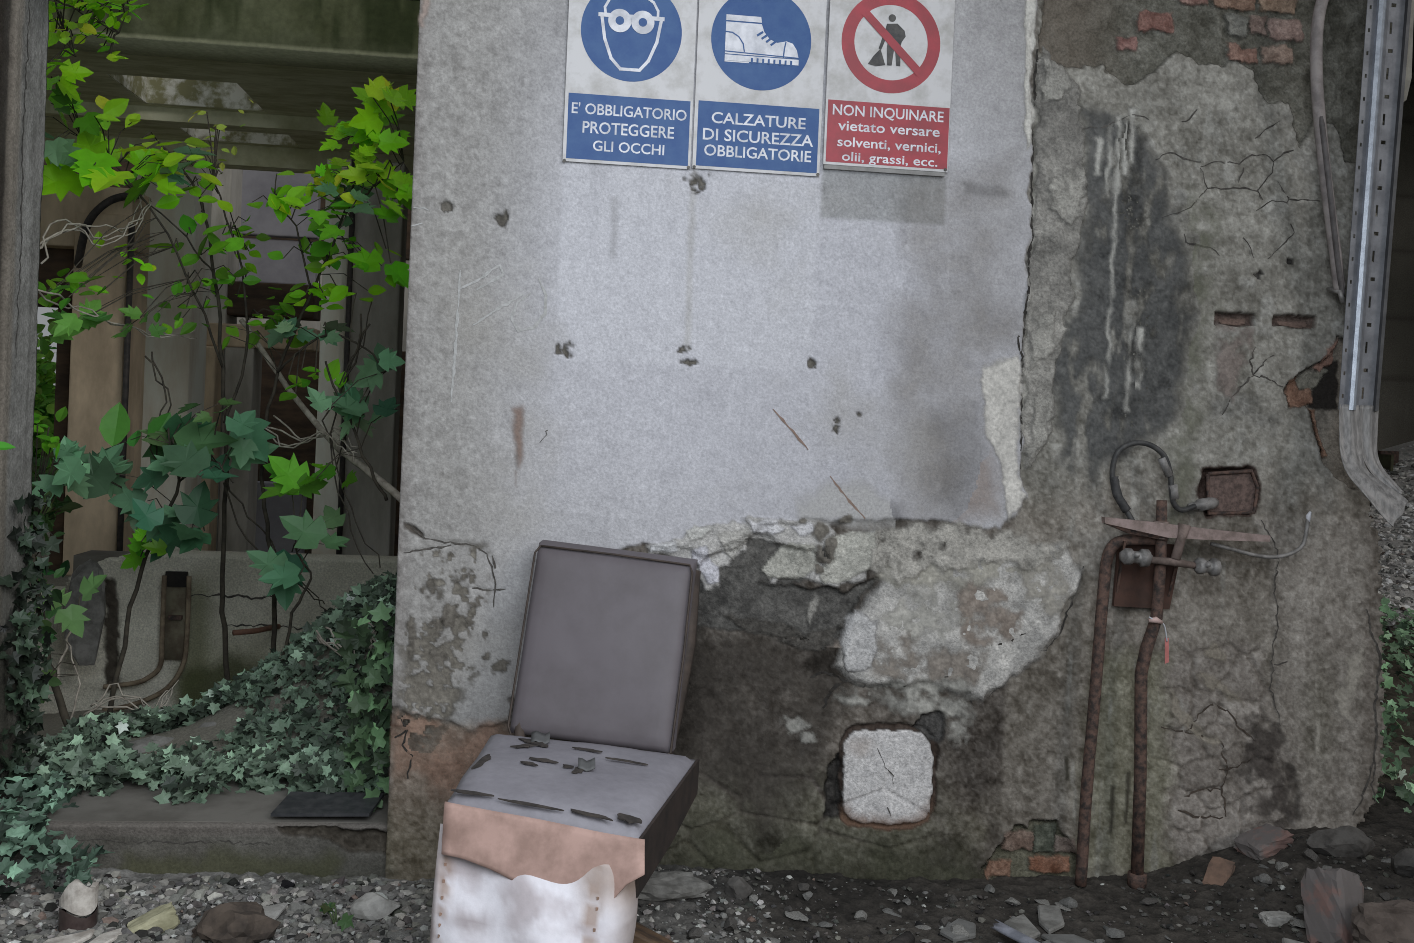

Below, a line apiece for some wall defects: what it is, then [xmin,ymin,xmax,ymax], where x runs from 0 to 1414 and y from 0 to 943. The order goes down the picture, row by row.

crack [1083,109,1320,259]
water stain [1053,106,1191,476]
flaking render [981,0,1371,520]
spalling [404,523,423,538]
peeling [392,545,509,741]
flaking render [647,515,877,651]
flaking render [786,718,815,743]
flaking render [824,753,842,818]
flaking render [838,678,972,742]
flaking render [981,820,1076,879]
crack [1161,520,1287,819]
crack [1353,609,1382,815]